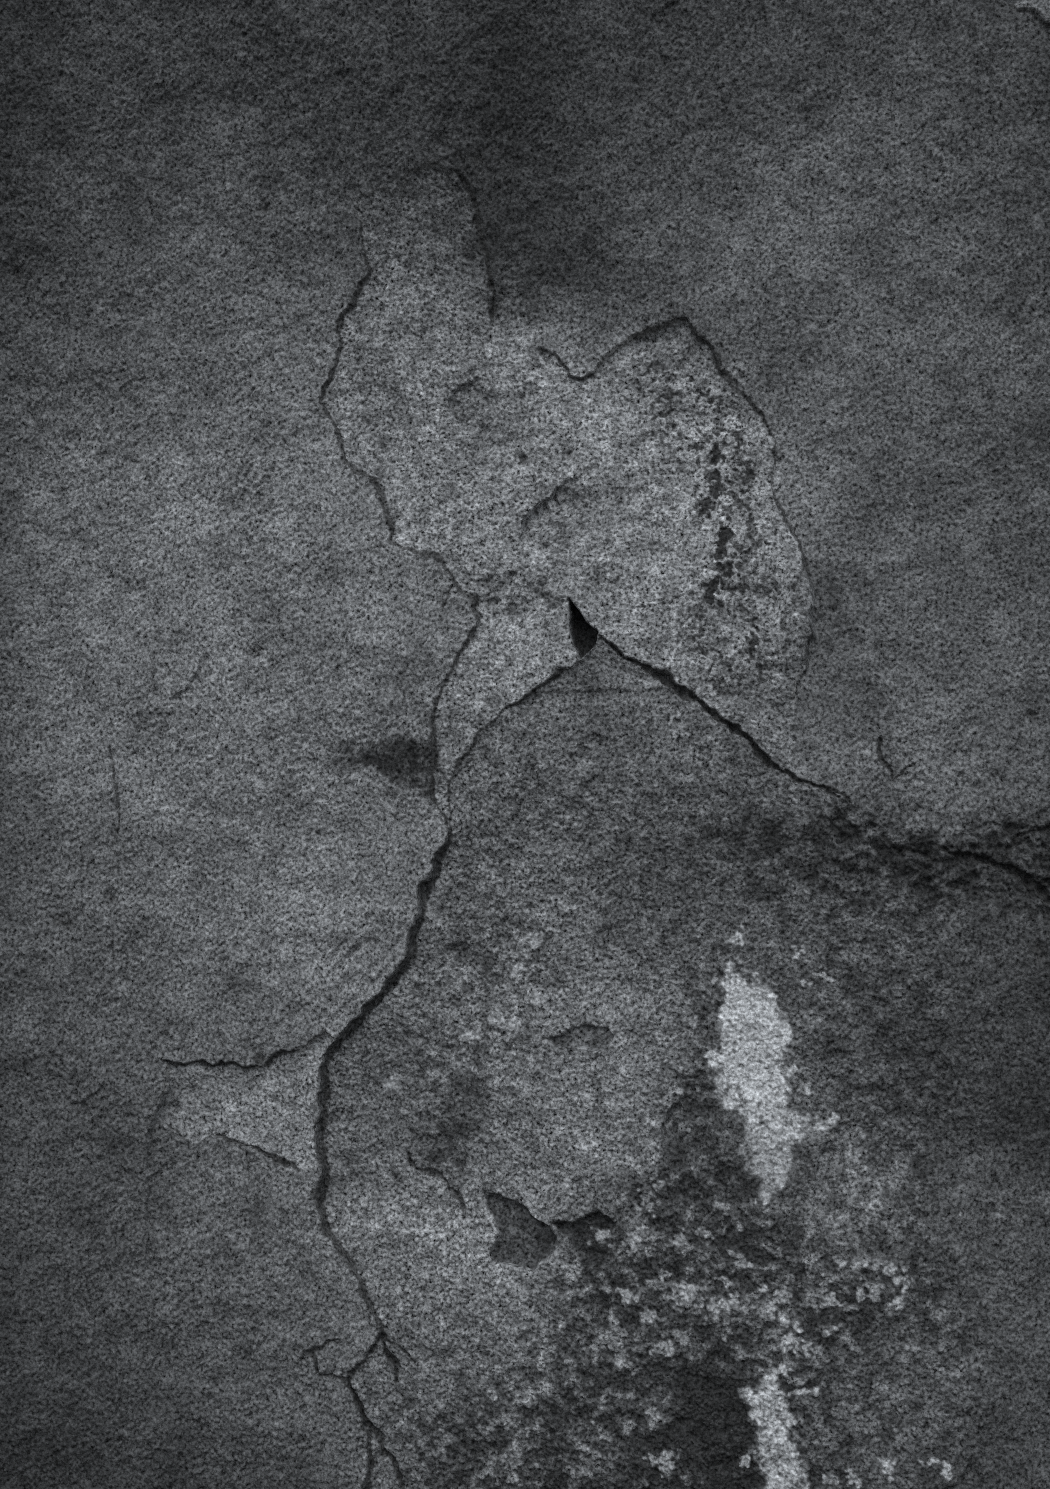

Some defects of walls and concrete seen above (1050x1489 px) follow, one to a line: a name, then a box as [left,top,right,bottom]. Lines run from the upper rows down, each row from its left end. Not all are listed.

crack [1003,0,1050,30]
crack [449,166,499,323]
crack [537,346,597,385]
crack [680,317,816,685]
crack [636,593,683,610]
crack [157,195,571,1489]
spalling [143,158,980,1489]
crack [597,634,854,804]
crack [874,735,918,780]
crack [879,823,1050,909]
leakage [359,774,1050,1489]